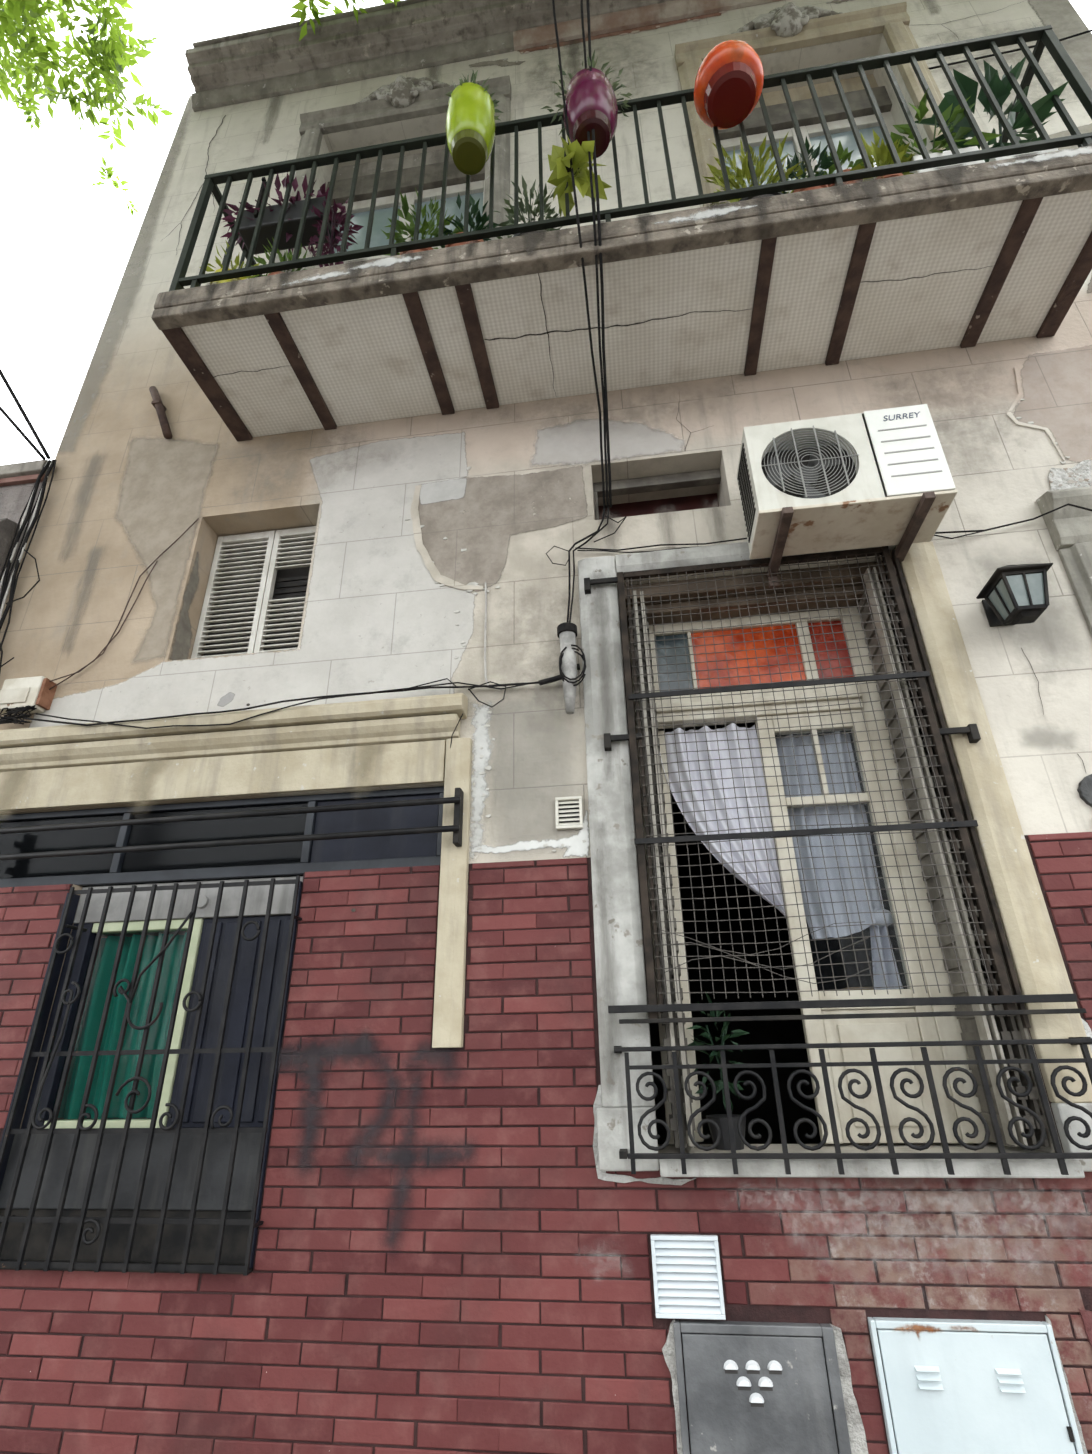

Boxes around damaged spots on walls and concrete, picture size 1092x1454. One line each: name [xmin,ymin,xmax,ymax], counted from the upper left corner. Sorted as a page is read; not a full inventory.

crack [860,266,990,283]
flaking render [1006,345,1092,491]
flaking render [406,465,587,595]